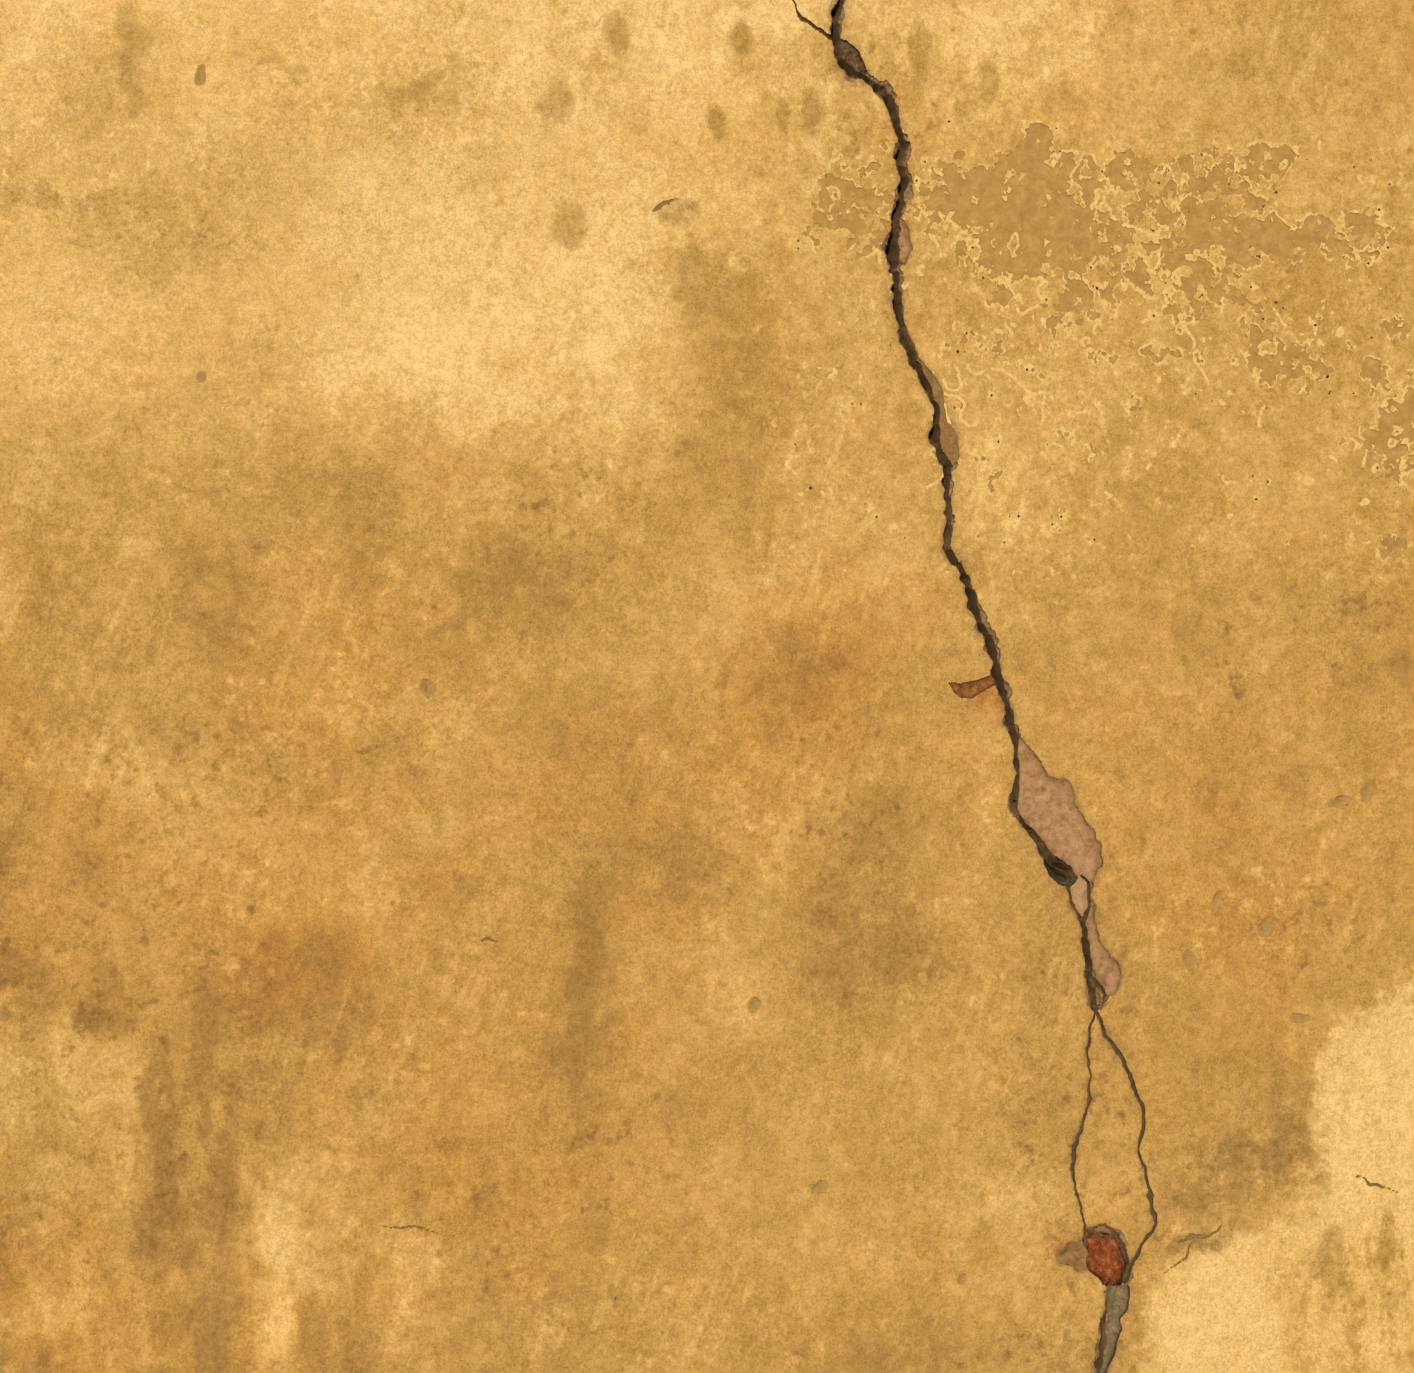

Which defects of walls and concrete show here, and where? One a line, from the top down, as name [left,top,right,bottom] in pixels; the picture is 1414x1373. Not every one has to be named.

peeling [800,119,1414,520]
damp [123,956,253,1373]
damp [547,822,627,1130]
crack [792,0,1222,1373]
spalling [1017,737,1122,996]
peeling [1365,533,1412,561]